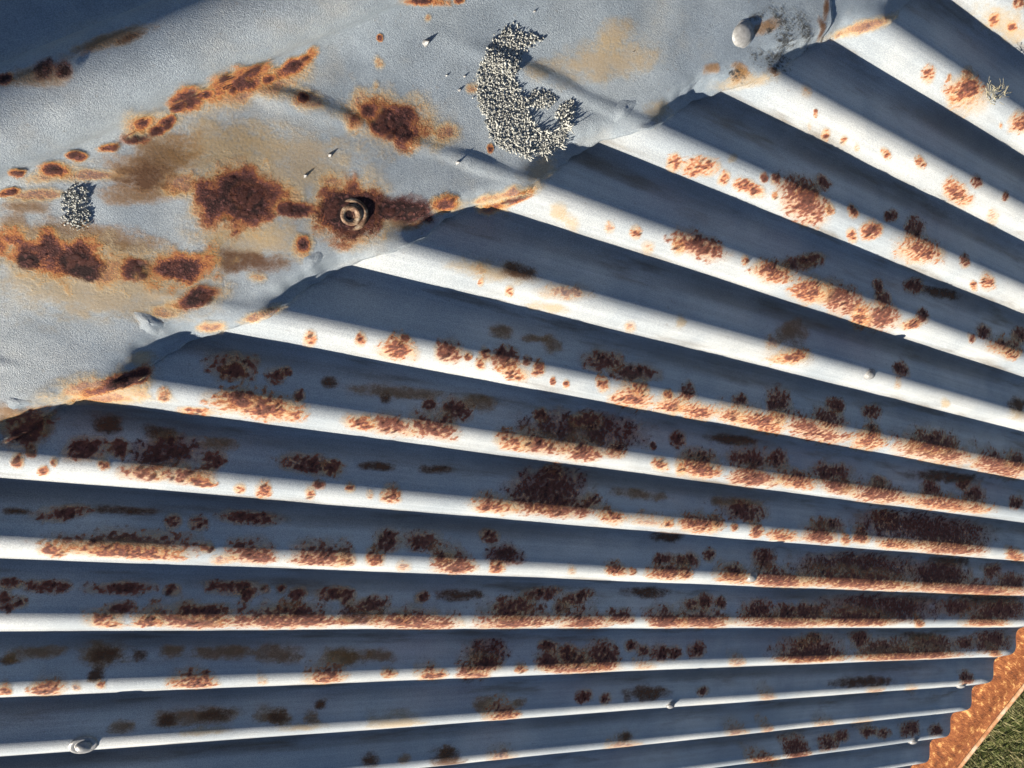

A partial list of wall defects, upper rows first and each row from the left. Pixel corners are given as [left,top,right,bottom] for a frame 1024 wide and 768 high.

rust [921,66,985,109]
rust [0,47,537,318]
rust [664,154,944,265]
rust [741,252,929,331]
rust [0,350,1024,688]